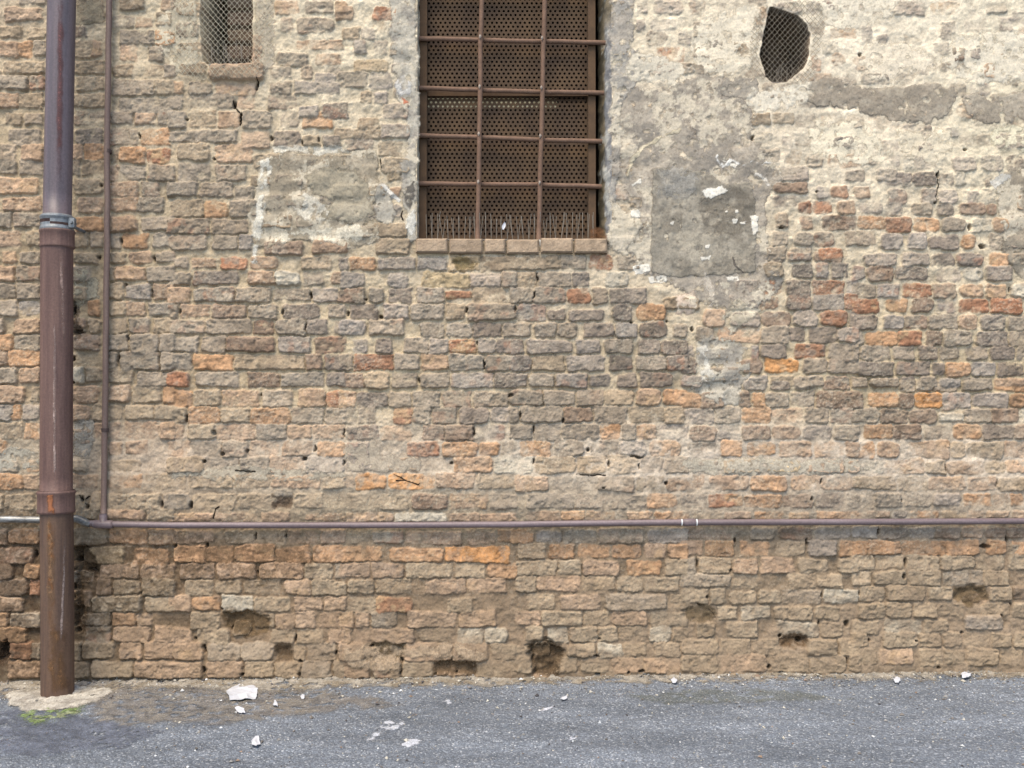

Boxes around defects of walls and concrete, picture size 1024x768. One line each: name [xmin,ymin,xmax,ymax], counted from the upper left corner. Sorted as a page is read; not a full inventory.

corrosion [591,228,606,238]
spalling [953,586,987,607]
spalling [222,609,269,638]
spalling [528,640,563,675]